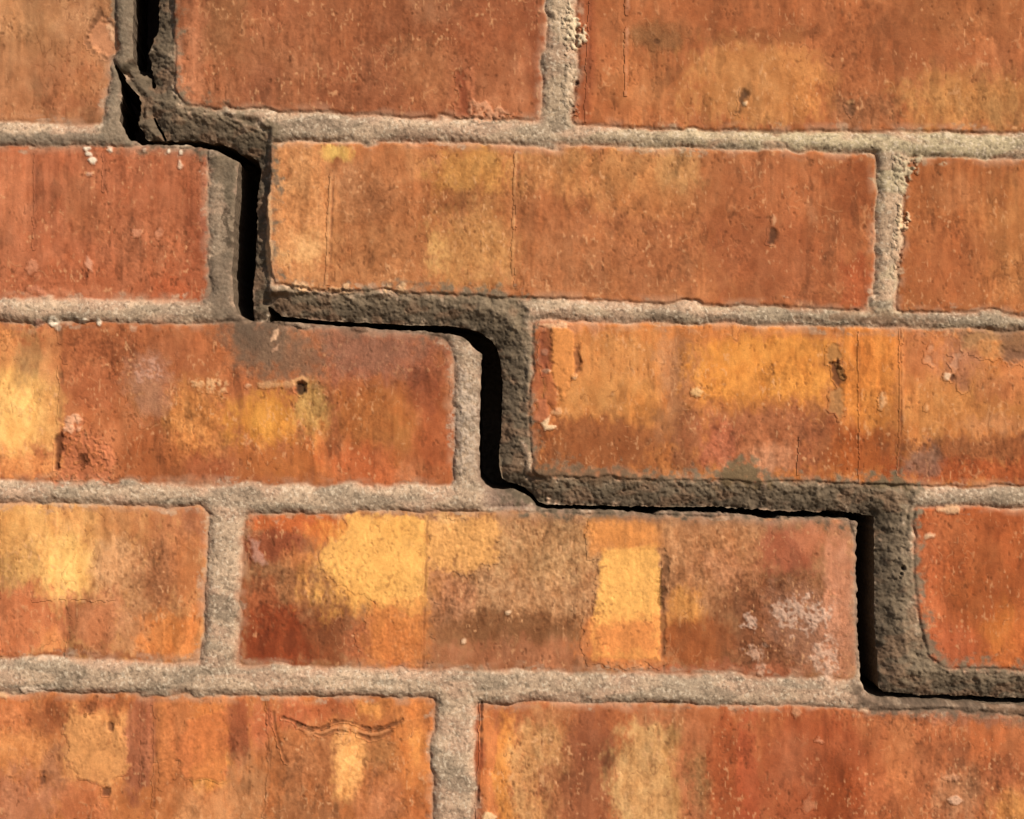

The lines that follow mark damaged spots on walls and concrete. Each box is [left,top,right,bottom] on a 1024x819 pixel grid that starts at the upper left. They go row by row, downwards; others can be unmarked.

crack [115,0,1024,705]